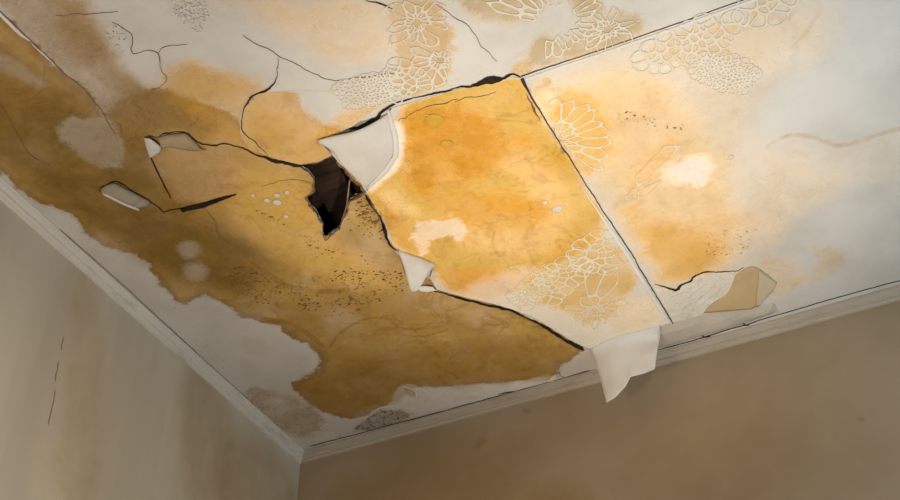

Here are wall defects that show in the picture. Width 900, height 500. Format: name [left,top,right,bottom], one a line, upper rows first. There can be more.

crack [321,4,521,139]
crack [100,35,394,238]
peeling [375,123,403,186]
water stain [578,91,693,173]
water stain [0,18,601,445]
crack [365,194,398,252]
crack [655,267,744,291]
crack [657,280,900,351]